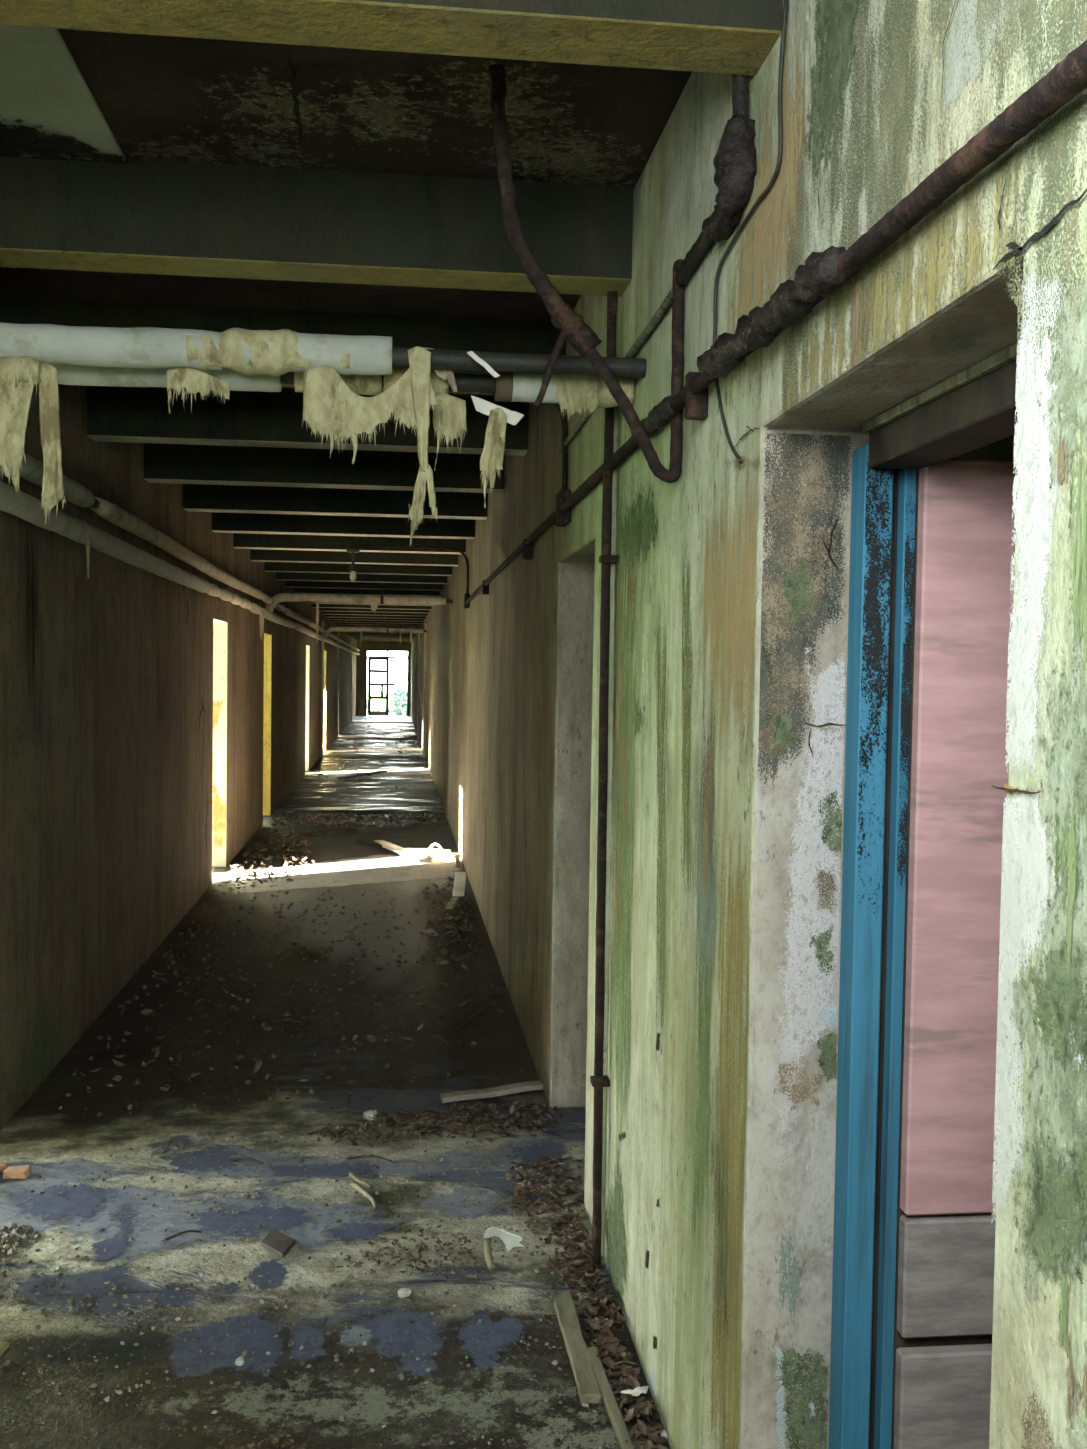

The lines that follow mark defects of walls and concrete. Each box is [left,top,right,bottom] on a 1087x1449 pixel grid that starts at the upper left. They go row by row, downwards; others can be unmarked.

damp [725,0,1087,334]
crack [993,179,1087,270]
damp [614,520,639,971]
damp [690,88,1087,1449]
damp [124,1350,647,1449]